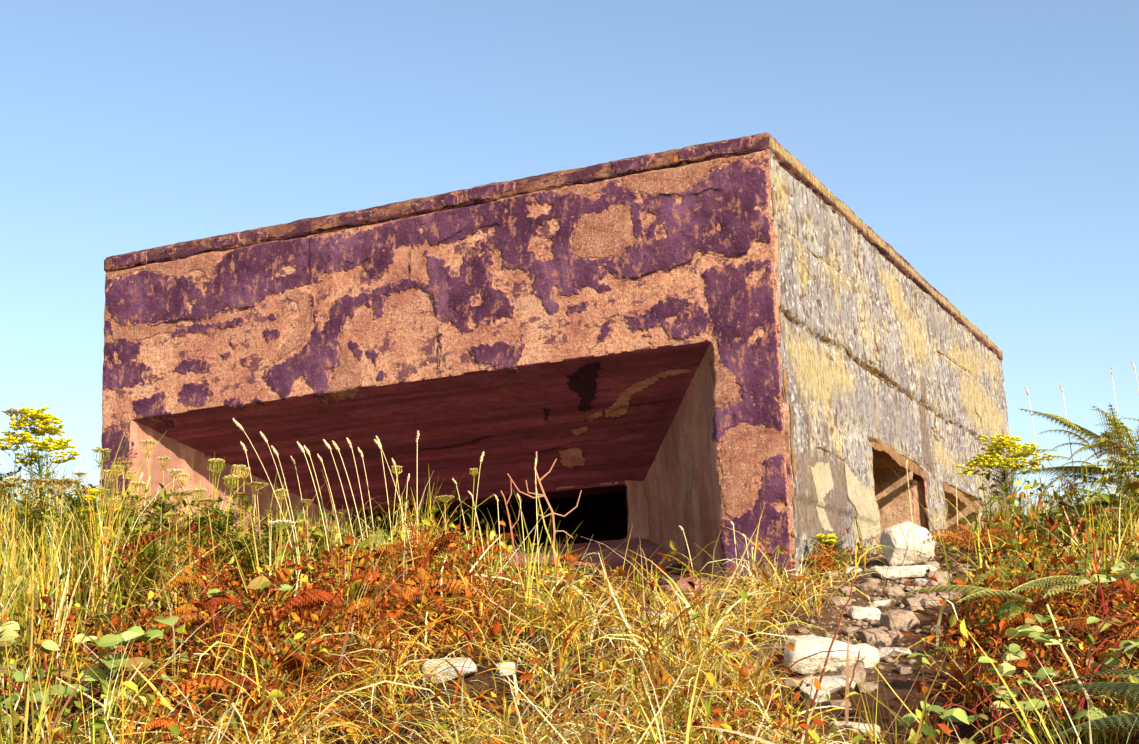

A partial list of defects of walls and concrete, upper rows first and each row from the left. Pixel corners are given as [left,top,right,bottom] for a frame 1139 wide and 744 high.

peeling [101,136,797,585]
leakage [567,362,600,412]
spalling [811,462,881,540]